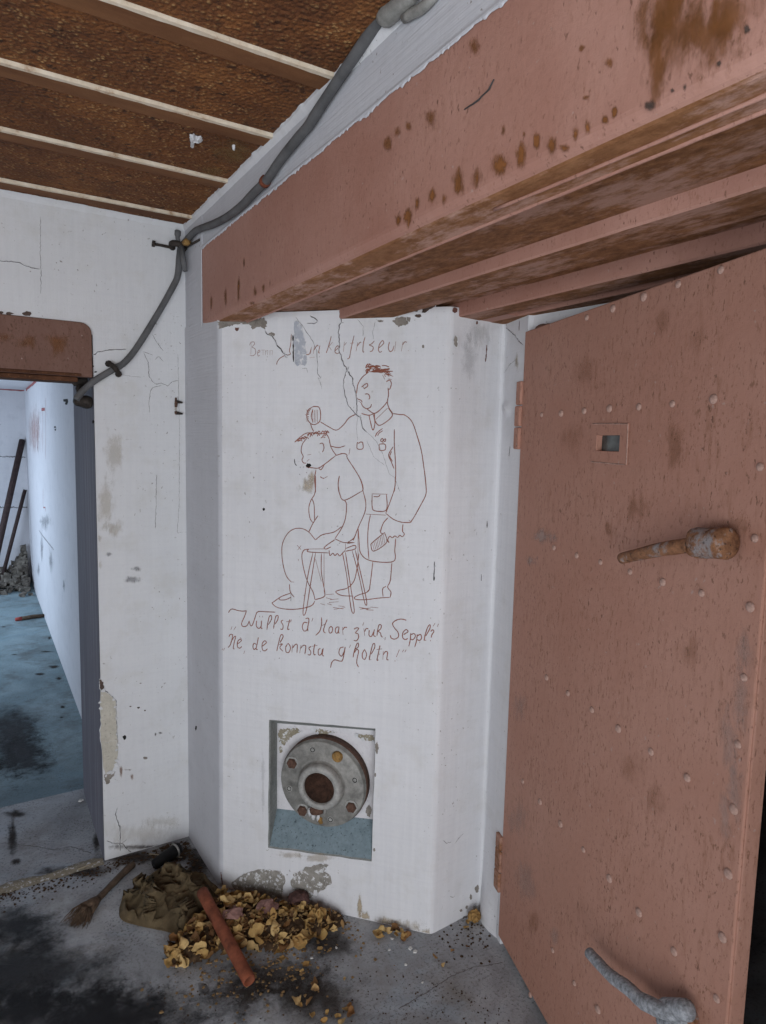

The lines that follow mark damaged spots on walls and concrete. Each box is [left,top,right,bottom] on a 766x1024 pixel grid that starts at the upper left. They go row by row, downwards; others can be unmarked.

rust [639,0,750,110]
rust [494,123,590,174]
rust [396,167,479,228]
crack [265,313,400,491]
water stain [0,709,49,770]
flaking render [98,679,146,784]
peeling [221,863,333,900]